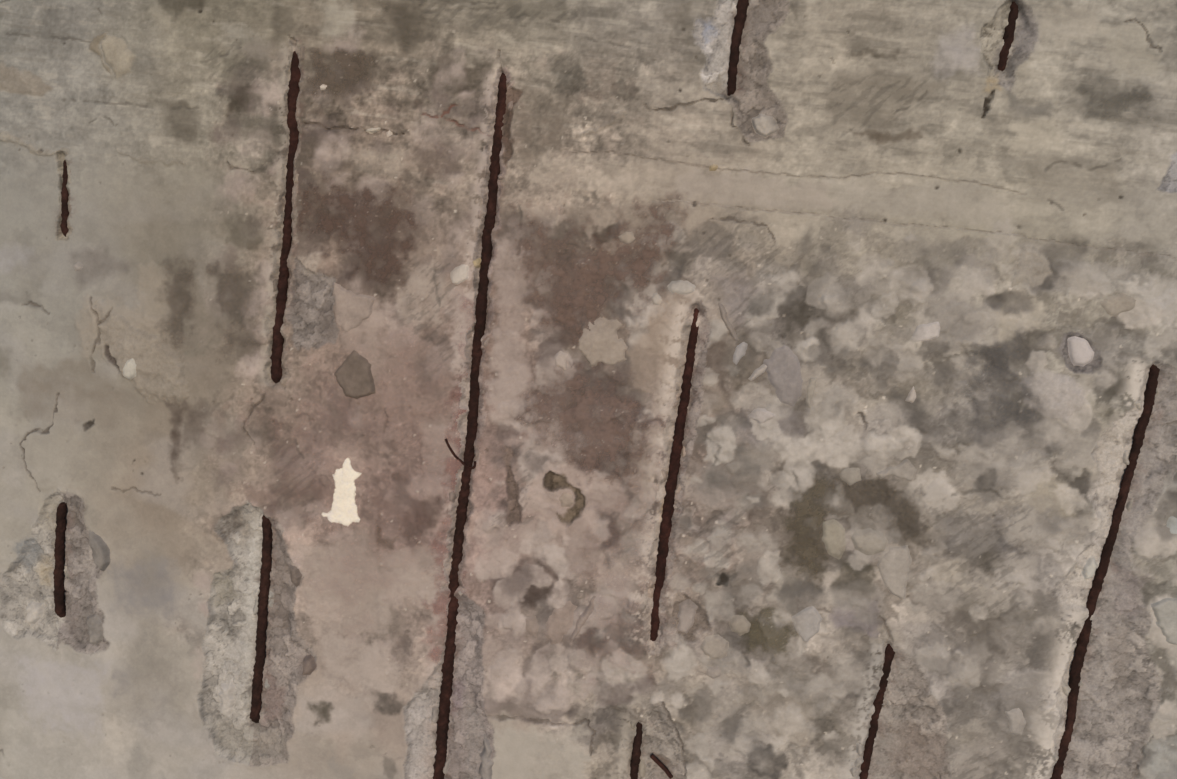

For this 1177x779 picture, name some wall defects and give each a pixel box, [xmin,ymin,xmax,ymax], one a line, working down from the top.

crack [20,393,60,480]
spalling [0,488,112,656]
spalling [197,499,319,767]
spalling [402,65,525,779]
spalling [543,470,587,526]
peeling [554,313,627,371]
spalling [643,280,751,679]
peeling [822,519,912,599]
spalling [1059,330,1104,374]
spalling [1047,358,1177,779]
spalling [627,702,687,779]
spalling [850,638,952,779]